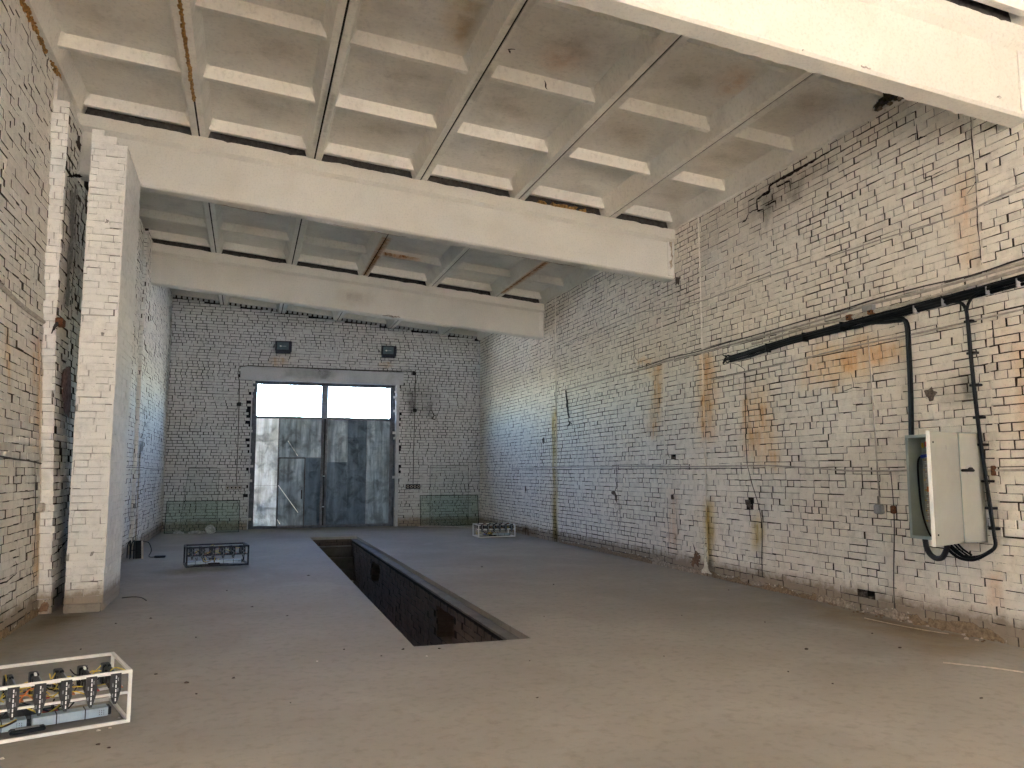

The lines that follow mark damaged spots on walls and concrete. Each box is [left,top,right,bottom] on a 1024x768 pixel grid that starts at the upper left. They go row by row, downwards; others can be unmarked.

spalling [872,93,904,111]
crack [742,150,831,223]